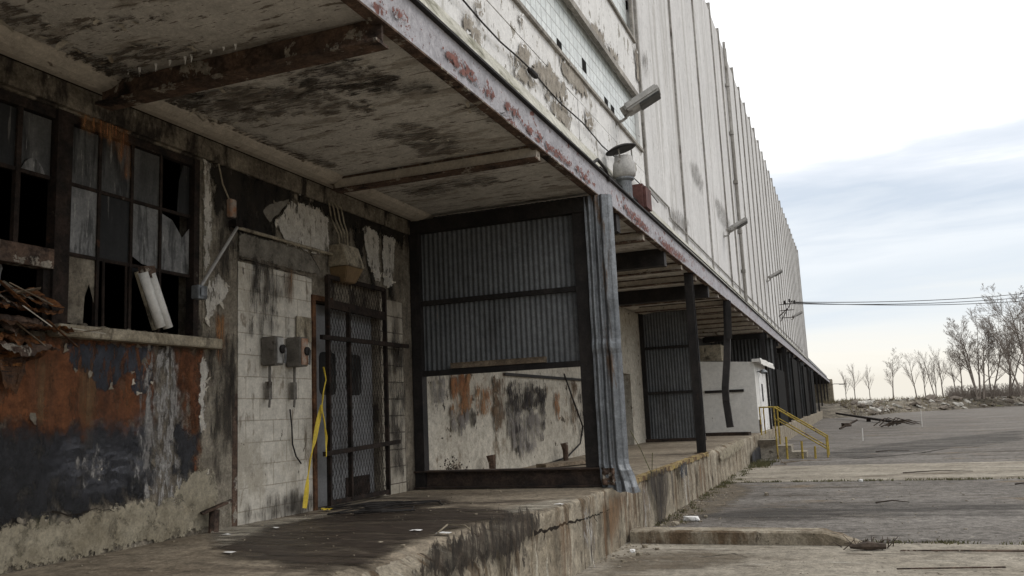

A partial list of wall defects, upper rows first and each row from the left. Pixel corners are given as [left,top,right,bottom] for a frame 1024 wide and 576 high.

water stain [252,59,437,113]
rust [341,0,599,196]
peeling [203,159,230,327]
peeling [275,194,330,255]
peeling [363,226,396,288]
rust [613,207,830,383]
rust [0,280,157,440]
rust [173,348,204,471]
water stain [504,380,547,459]
peeling [0,413,219,575]
water stain [217,489,526,572]
crack [534,509,609,539]